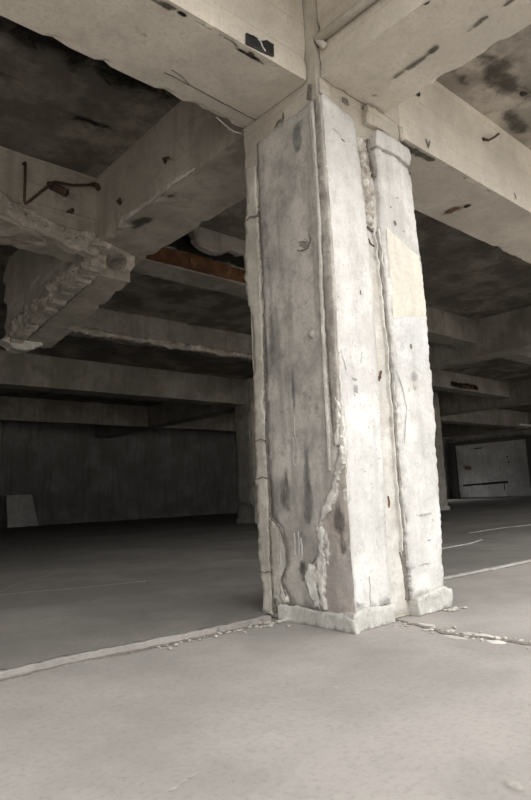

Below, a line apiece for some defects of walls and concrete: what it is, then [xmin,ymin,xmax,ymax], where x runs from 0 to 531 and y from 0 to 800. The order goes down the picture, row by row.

crack [164,70,256,121]
damp [393,46,439,79]
damp [477,56,531,99]
damp [505,112,527,133]
spalling [356,134,376,227]
spalling [0,161,135,354]
rust [146,247,246,283]
spalling [71,325,253,360]
rust [451,381,478,390]
crack [255,327,277,613]
spalling [303,351,355,614]
crack [395,619,531,646]